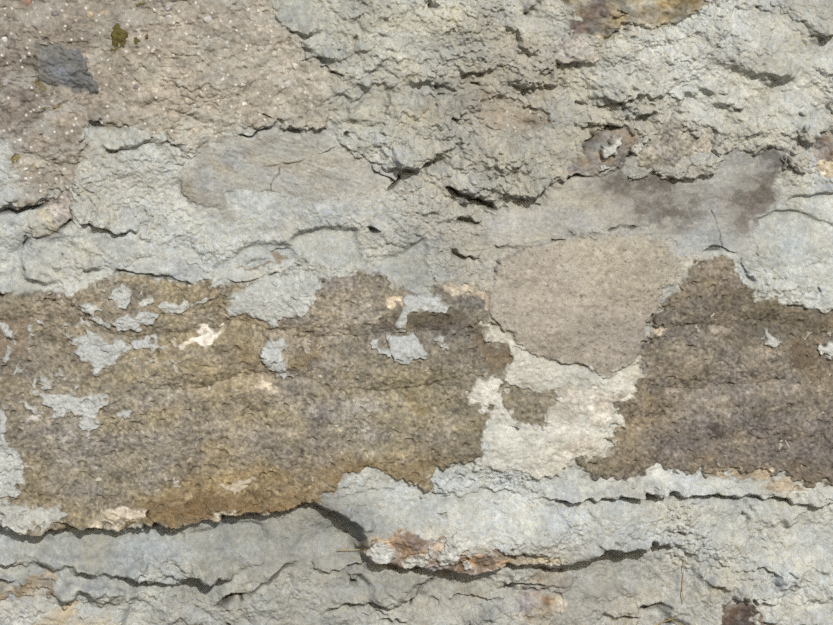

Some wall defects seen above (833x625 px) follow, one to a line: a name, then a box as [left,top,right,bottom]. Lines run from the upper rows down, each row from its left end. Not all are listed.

peeling [137,291,155,307]
spalling [0,316,90,364]
peeling [367,338,391,358]
spalling [475,324,512,371]
peeling [116,409,132,420]
peeling [219,476,256,495]